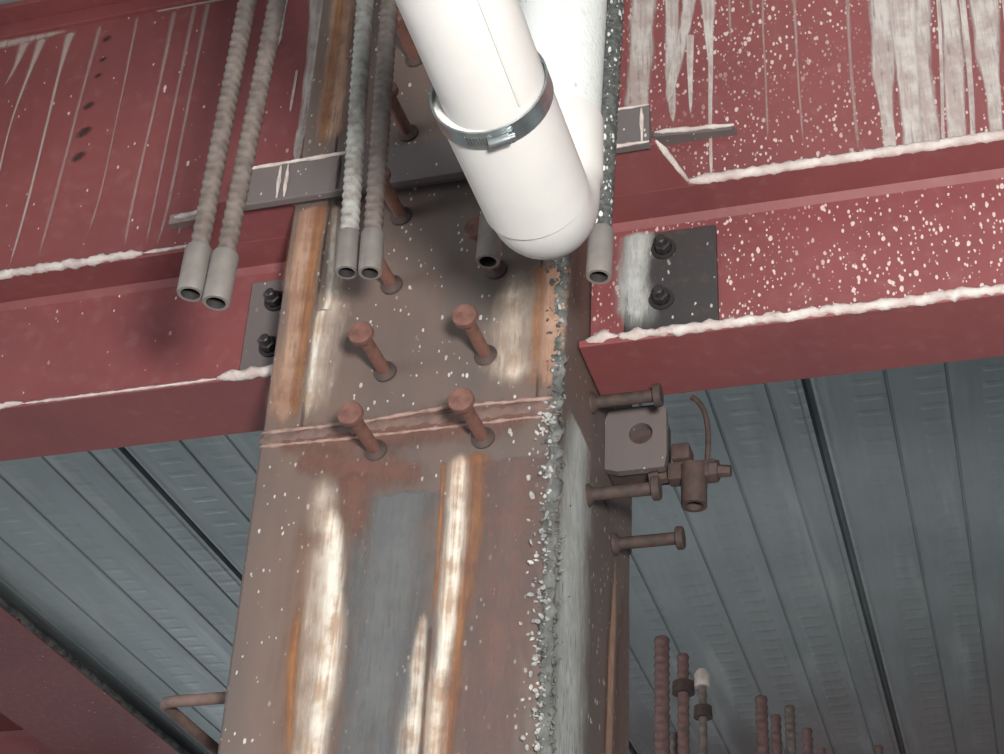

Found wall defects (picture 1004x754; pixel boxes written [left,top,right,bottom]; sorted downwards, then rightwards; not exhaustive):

damp [0,32,74,259]
damp [42,27,101,244]
damp [127,0,224,229]
rust [318,0,356,140]
damp [625,0,715,124]
damp [846,0,857,131]
damp [870,0,1004,147]
rust [271,206,328,421]
damp [294,485,343,754]
rust [419,628,431,754]
damp [398,455,470,754]
rust [434,463,445,599]